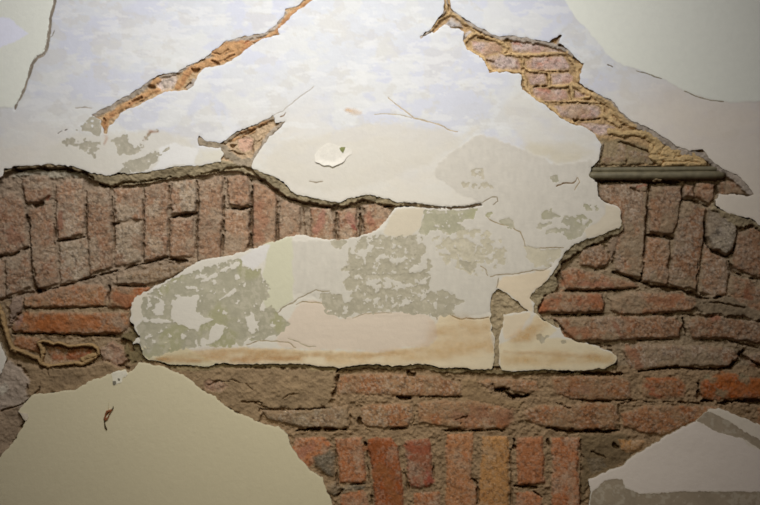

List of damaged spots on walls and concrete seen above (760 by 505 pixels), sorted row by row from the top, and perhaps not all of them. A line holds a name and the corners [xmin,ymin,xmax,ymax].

crack [14,0,57,110]
spalling [0,115,760,505]
spalling [420,0,760,371]